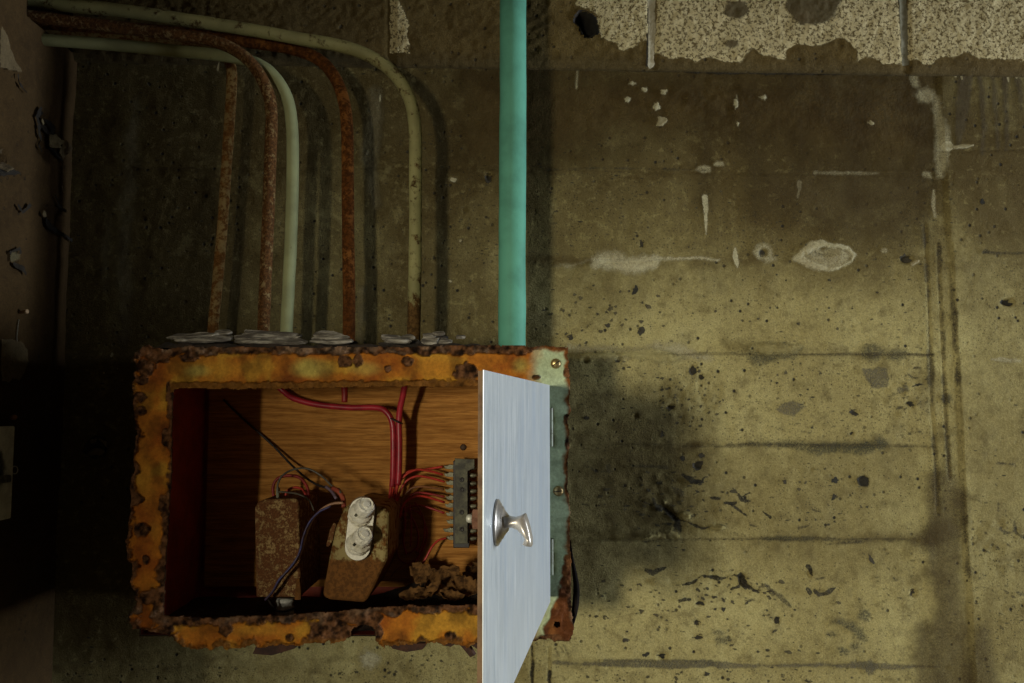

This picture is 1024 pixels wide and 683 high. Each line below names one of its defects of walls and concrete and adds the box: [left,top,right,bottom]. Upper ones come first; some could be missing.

peeling [389,0,410,54]
peeling [576,0,1024,65]
leakage [793,240,856,271]
leakage [727,440,886,455]